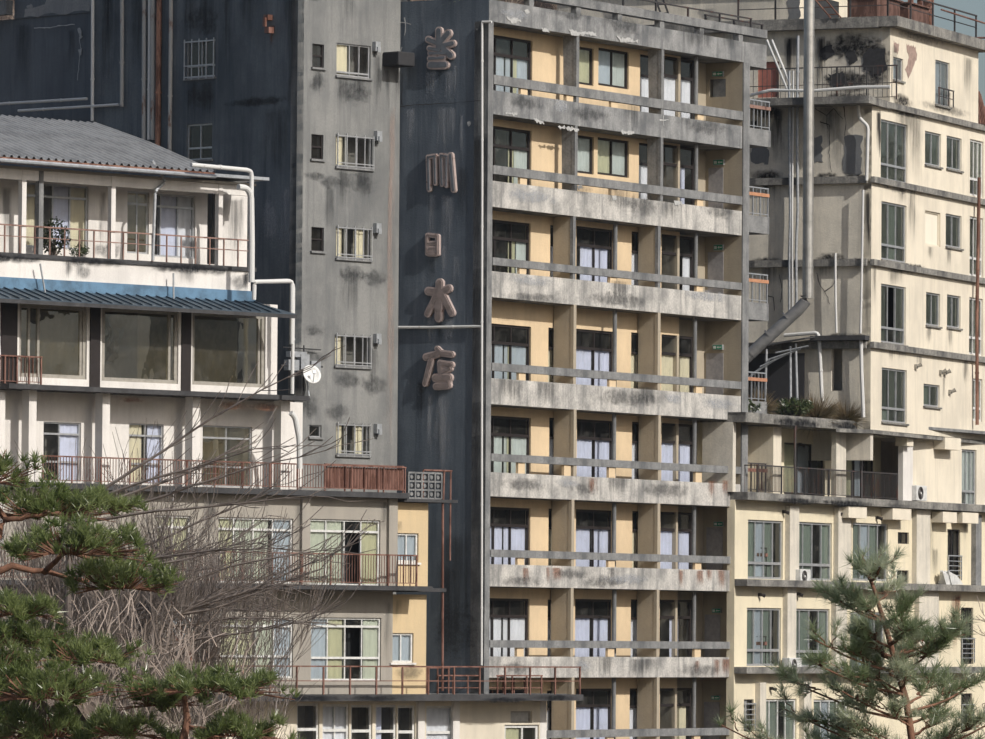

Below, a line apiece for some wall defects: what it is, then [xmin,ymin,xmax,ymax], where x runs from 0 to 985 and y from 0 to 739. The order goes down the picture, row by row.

spalling [24,0,91,17]
peeling [786,38,797,70]
peeling [818,34,917,91]